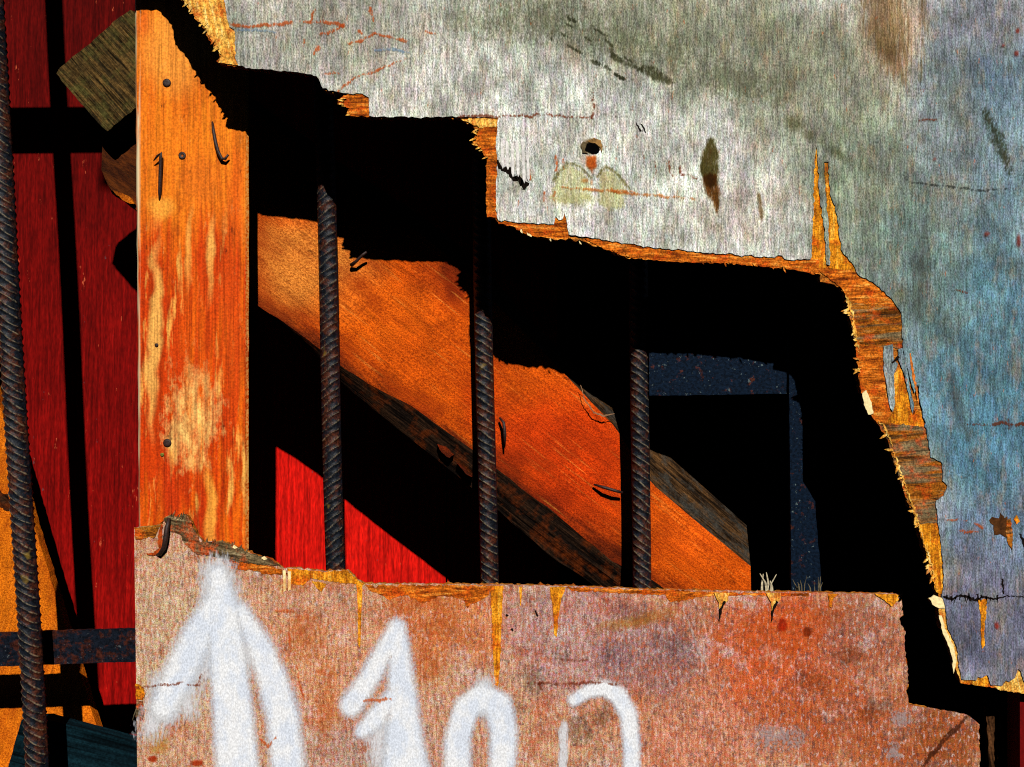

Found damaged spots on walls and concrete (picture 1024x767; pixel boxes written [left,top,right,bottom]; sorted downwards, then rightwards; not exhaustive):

peeling [222,77,1024,694]
crack [943,579,1023,603]